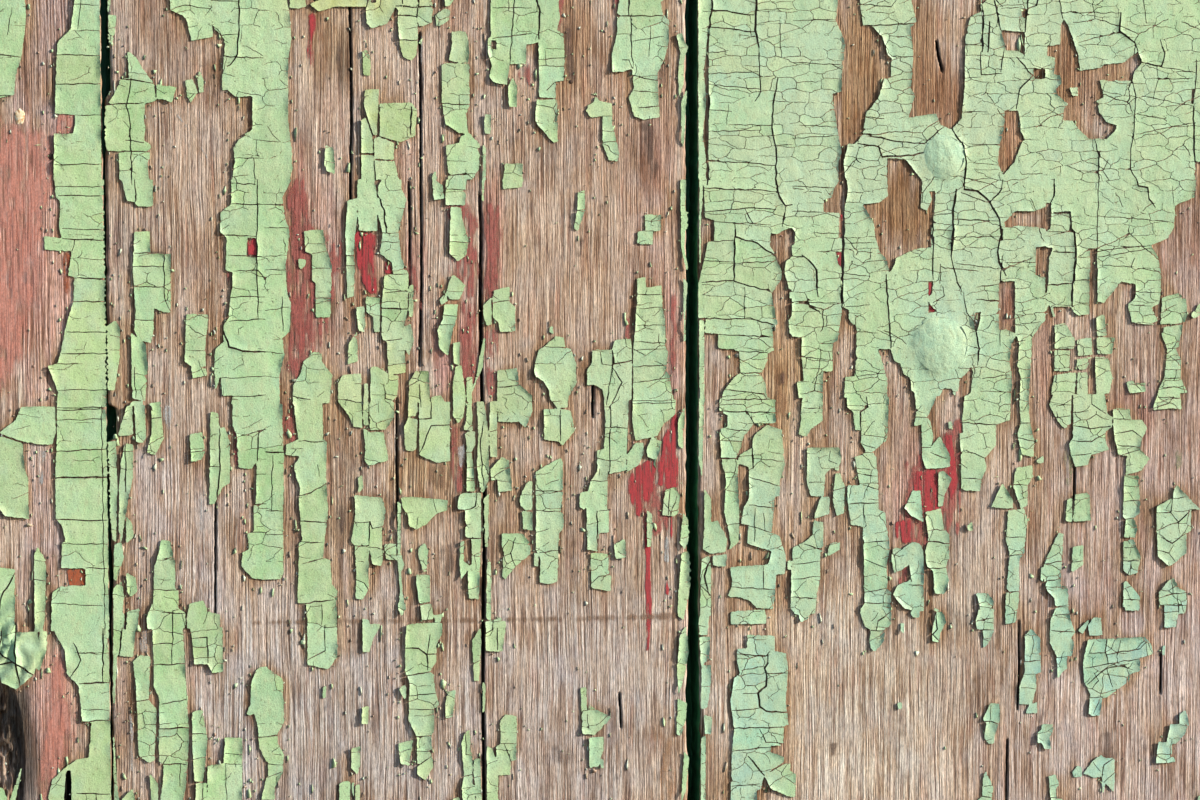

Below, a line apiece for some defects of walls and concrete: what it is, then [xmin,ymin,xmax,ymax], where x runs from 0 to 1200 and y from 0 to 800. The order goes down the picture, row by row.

crack [347,26,355,200]
crack [408,34,422,366]
peeling [0,0,243,800]
peeling [170,0,685,780]
crack [477,203,485,433]
peeling [612,0,1200,800]
peeling [247,667,284,800]
peeling [339,746,361,800]
crack [480,464,488,800]
peeling [453,714,517,800]
crack [1002,740,1010,800]
crack [1014,625,1022,710]